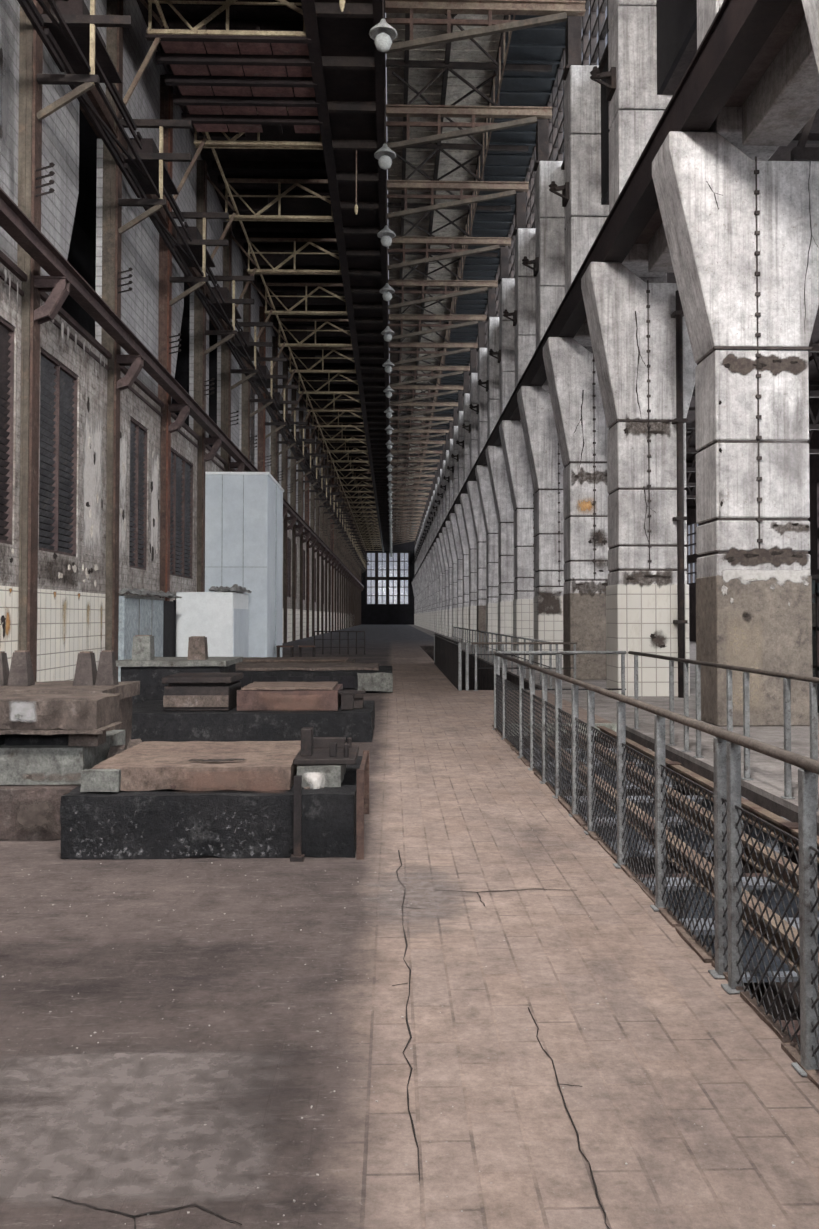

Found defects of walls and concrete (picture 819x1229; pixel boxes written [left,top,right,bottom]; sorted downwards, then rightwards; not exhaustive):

spalling [722,353,807,376]
spalling [624,416,670,439]
corrosion [578,501,596,511]
spalling [721,522,810,604]
crack [392,850,558,1181]
crack [528,1007,610,1229]